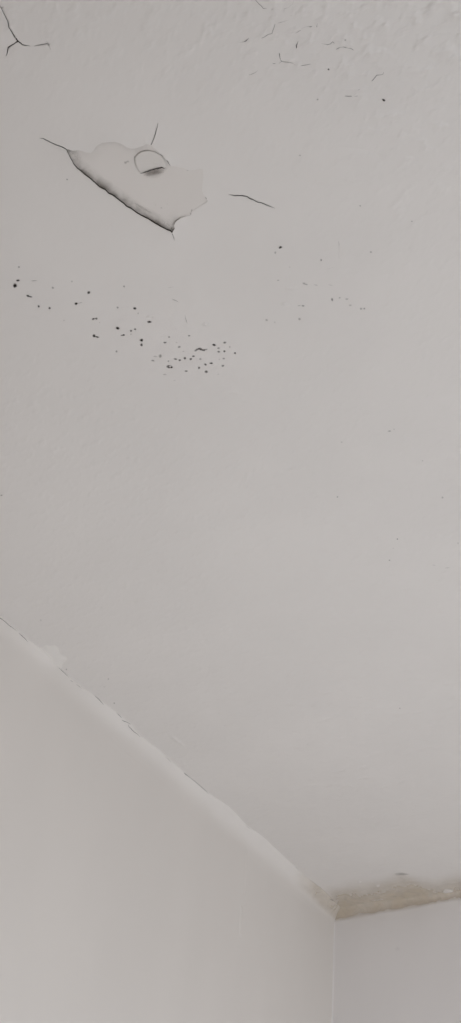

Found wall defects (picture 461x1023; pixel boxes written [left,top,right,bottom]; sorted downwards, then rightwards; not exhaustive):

crack [0,2,52,55]
peeling [17,97,243,270]
crack [230,192,275,208]